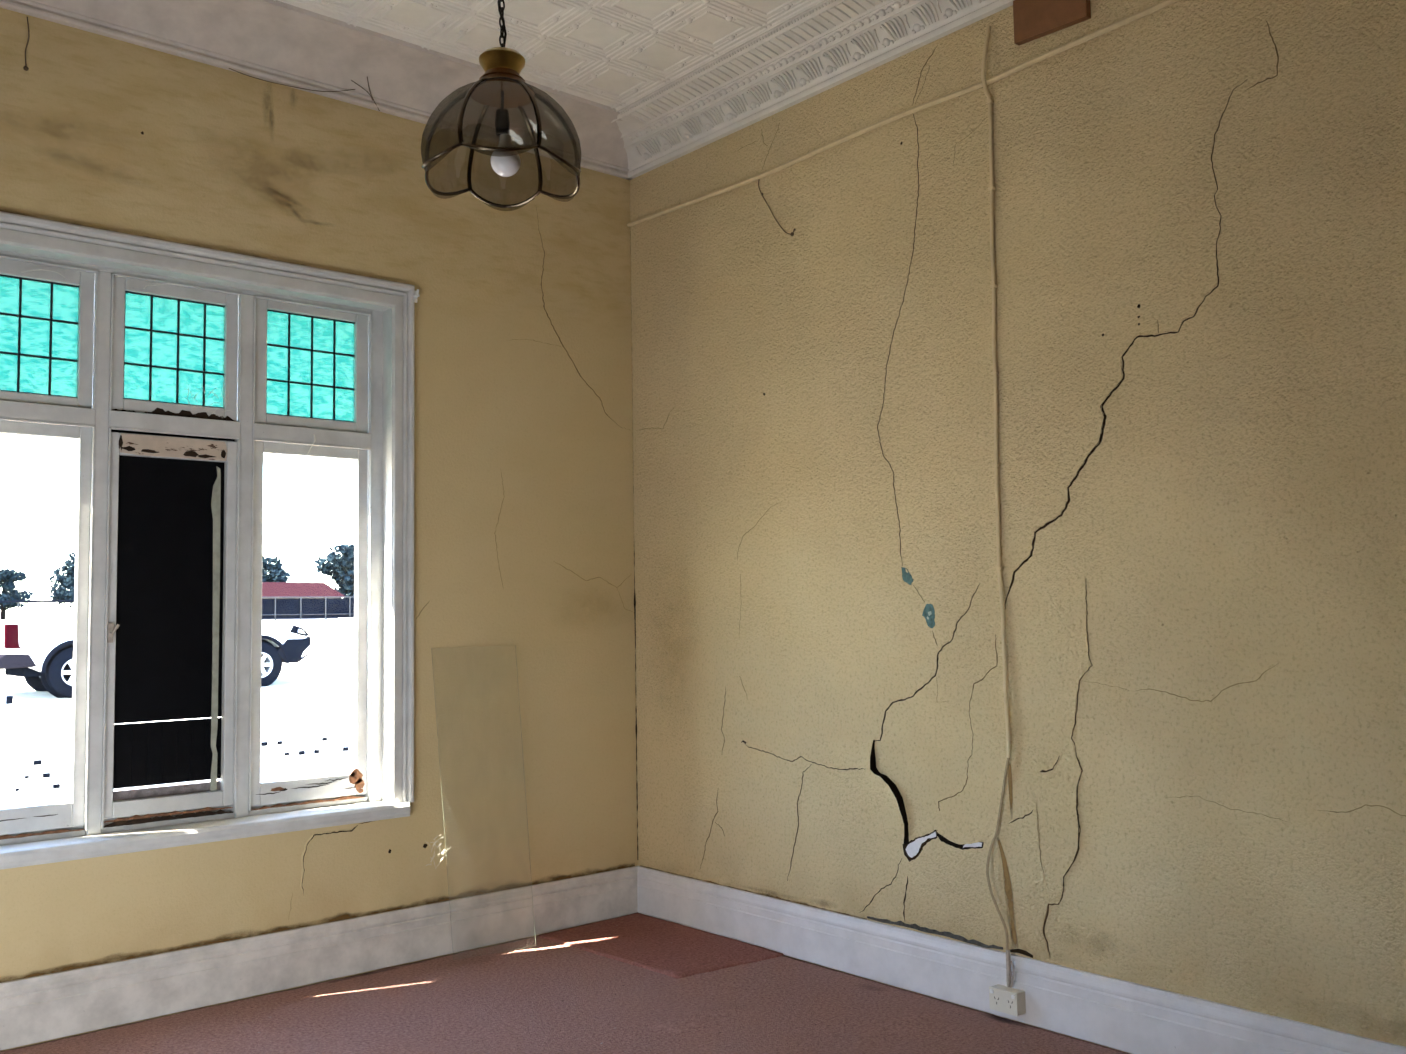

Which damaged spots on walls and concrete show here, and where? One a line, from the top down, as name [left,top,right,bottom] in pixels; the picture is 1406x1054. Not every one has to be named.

crack [512,207,674,430]
crack [721,21,1287,881]
crack [554,551,636,671]
crack [632,708,640,860]
crack [700,794,725,868]
crack [859,858,908,921]
flaking render [903,830,984,862]
crack [1008,578,1277,958]
crack [1319,804,1406,816]